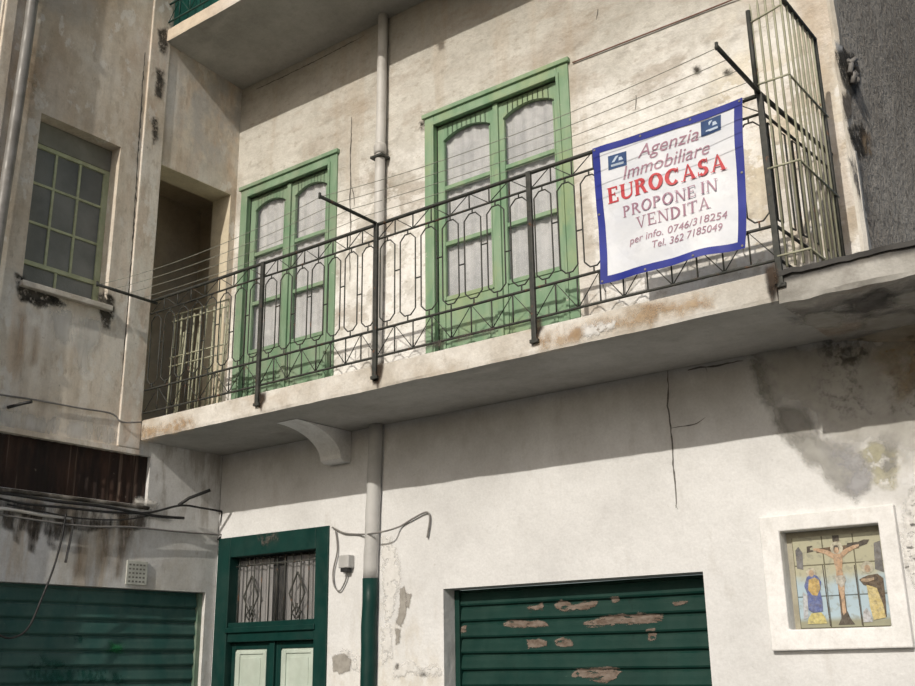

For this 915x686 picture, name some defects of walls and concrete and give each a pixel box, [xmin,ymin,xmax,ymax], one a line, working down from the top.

leakage [155,69,164,98]
leakage [158,28,167,53]
leakage [15,273,115,368]
leakage [847,290,897,315]
crack [667,361,738,509]
leakage [756,340,915,485]
peeling [902,489,915,584]
peeling [381,537,441,677]
peeling [332,650,361,674]